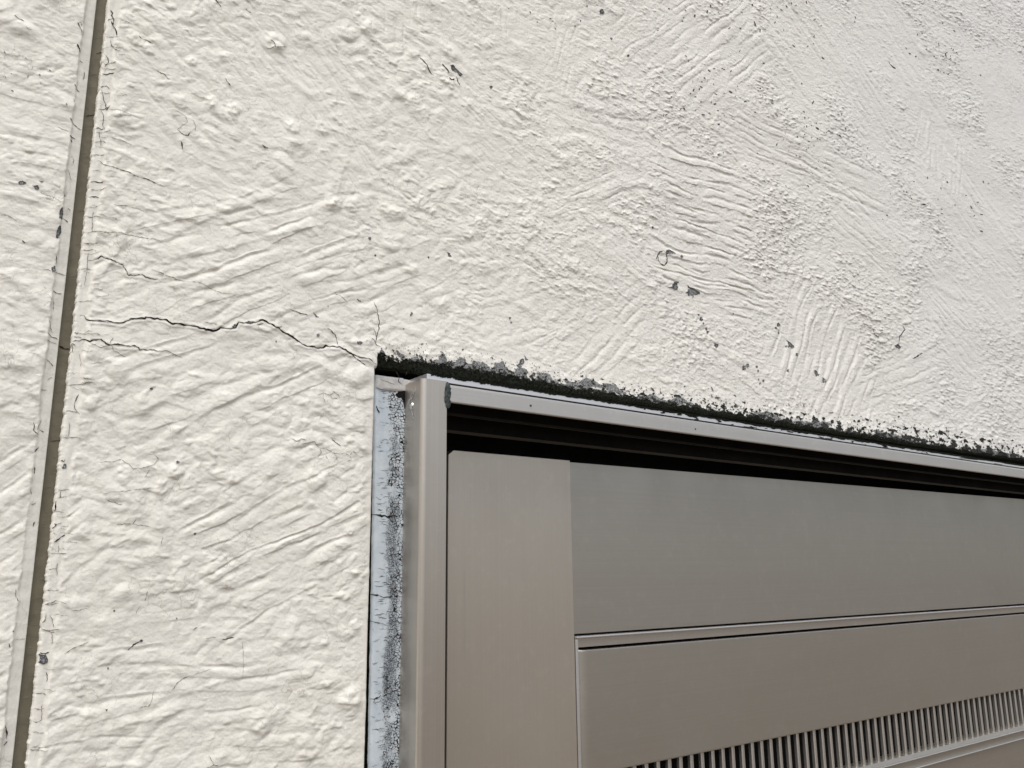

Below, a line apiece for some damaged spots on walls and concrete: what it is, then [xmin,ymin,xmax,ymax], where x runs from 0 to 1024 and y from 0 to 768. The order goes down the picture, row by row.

crack [4,11,407,768]
damp [376,343,1024,466]